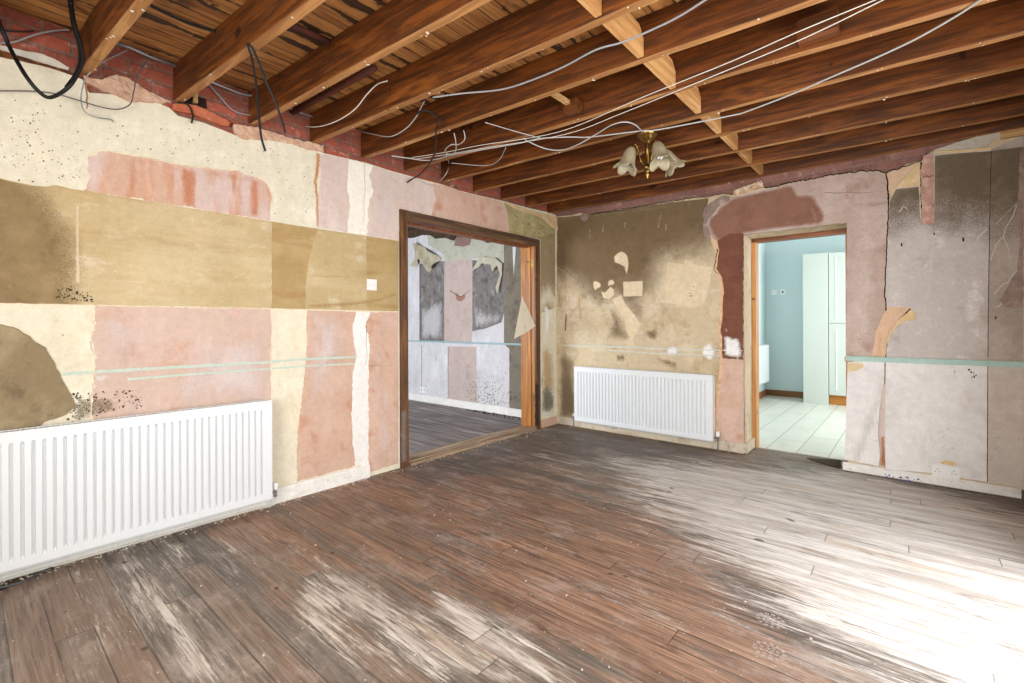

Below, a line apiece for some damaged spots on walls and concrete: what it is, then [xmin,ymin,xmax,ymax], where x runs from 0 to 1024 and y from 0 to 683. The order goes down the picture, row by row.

leakage [0,179,93,304]
leakage [66,390,142,422]
peeling [0,303,399,481]
peeling [83,74,350,233]
leakage [419,261,444,341]
peeling [367,166,558,295]
leakage [467,202,566,409]
crack [590,153,927,367]
peeling [703,147,991,443]
crack [967,151,1017,340]